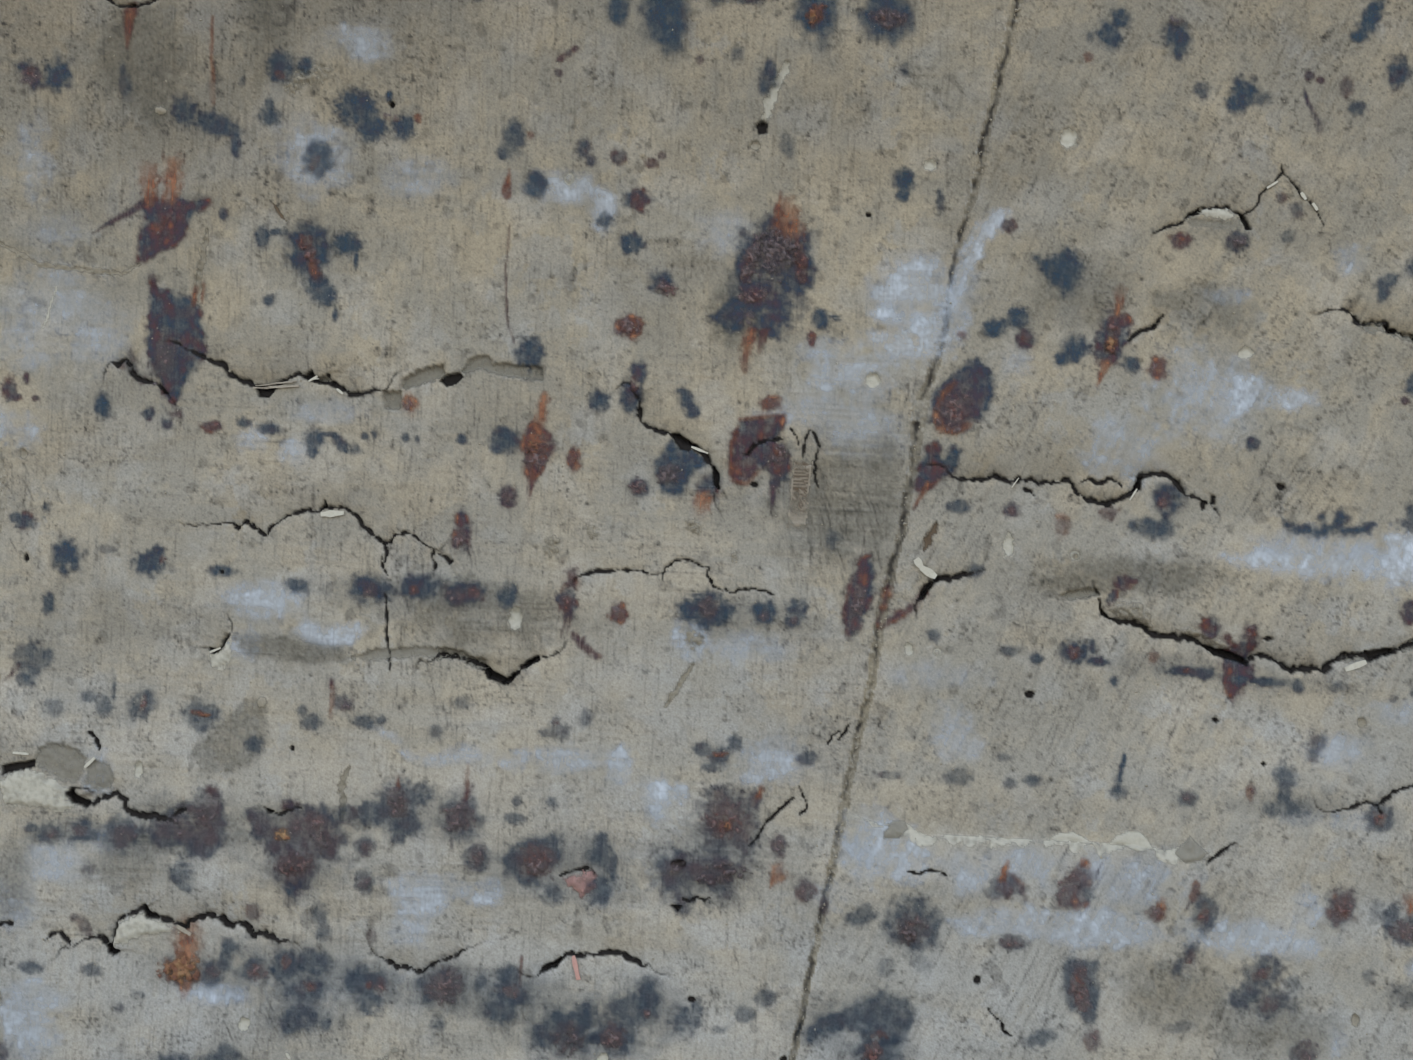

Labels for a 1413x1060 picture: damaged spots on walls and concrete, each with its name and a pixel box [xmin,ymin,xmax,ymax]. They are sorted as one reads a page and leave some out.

rust [105,169,211,262]
rust [146,278,207,416]
rust [628,395,791,508]
rust [914,358,993,506]
crack [930,464,1217,511]
crack [194,500,563,685]
crack [1094,588,1413,674]
leakage [648,781,687,817]
leakage [588,833,617,904]
leakage [847,813,929,880]
crack [47,904,289,955]
leakage [195,984,244,1004]